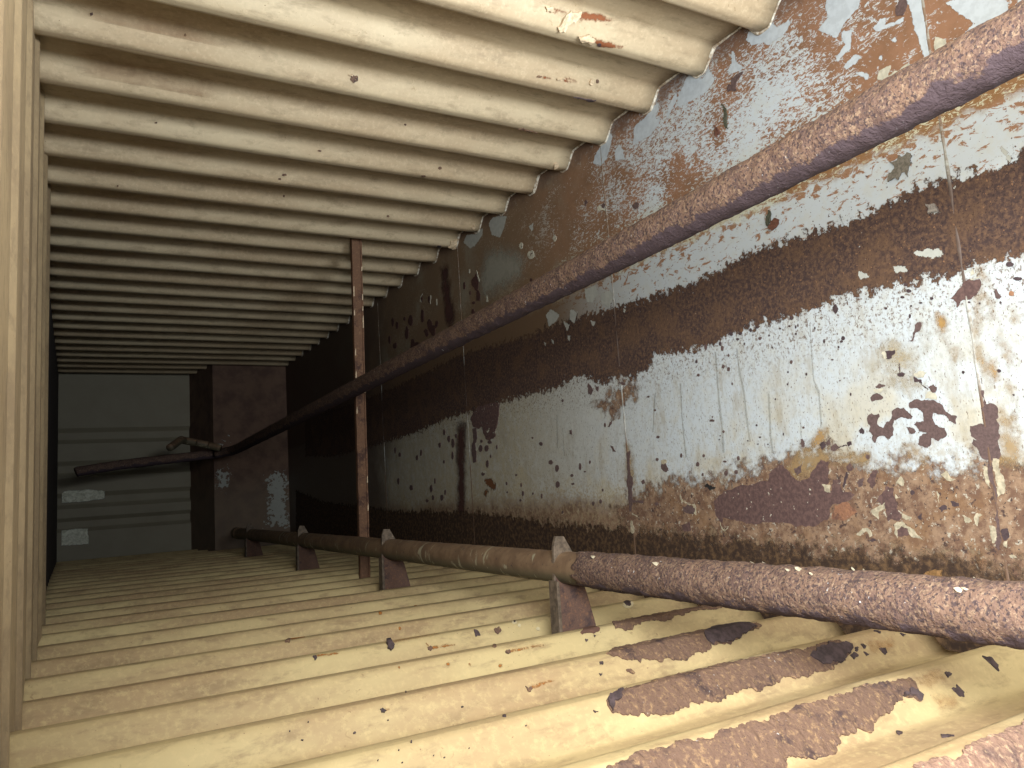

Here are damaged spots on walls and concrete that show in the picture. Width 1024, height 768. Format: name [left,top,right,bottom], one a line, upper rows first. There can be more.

peeling [818,0,910,80]
peeling [667,70,714,118]
peeling [593,133,625,166]
peeling [914,248,943,259]
peeling [950,268,981,307]
peeling [993,262,1022,304]
rust [296,138,1024,581]
peeling [704,316,799,385]
peeling [713,350,957,540]
peeling [944,671,965,697]
rust [935,637,987,652]
peeling [982,655,1000,672]